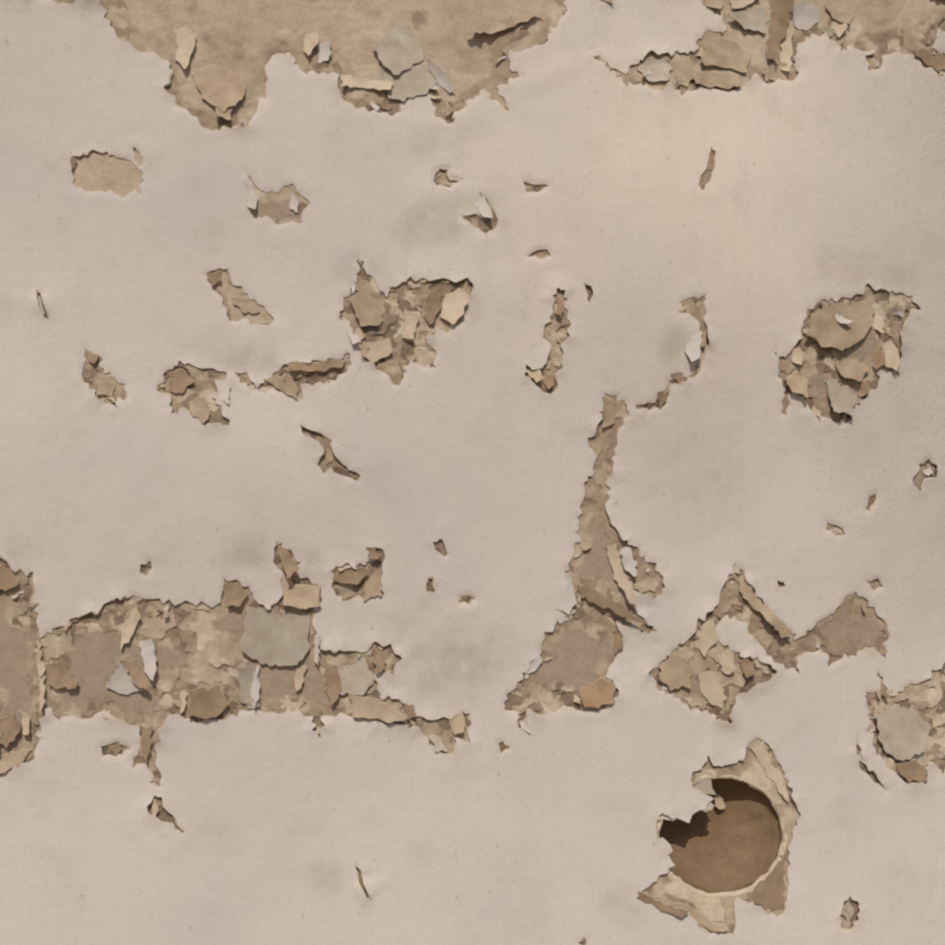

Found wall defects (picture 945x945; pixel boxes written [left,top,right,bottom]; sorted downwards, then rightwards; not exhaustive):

peeling [99,0,567,131]
peeling [595,0,945,94]
peeling [70,151,144,197]
peeling [82,350,126,405]
peeling [157,260,473,425]
peeling [775,284,920,425]
peeling [301,426,360,481]
peeling [504,288,709,733]
peeling [0,544,471,833]
peeling [649,564,889,723]
peeling [857,663,945,783]
spalling [652,742,790,910]